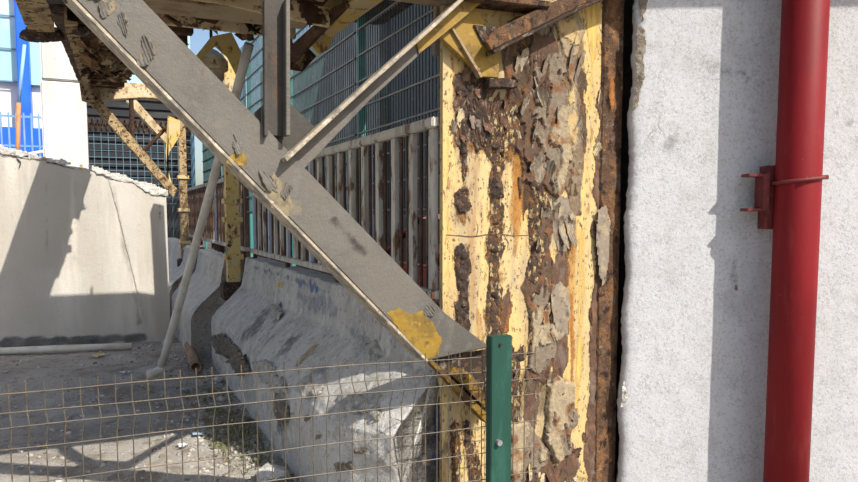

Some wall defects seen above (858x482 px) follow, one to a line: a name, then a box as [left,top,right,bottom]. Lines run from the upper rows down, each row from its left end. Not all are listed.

flaking render [632,0,648,111]
spalling [0,144,71,165]
spalling [88,165,168,197]
corrosion [451,69,522,336]
peeling [502,3,602,482]
corrosion [531,79,615,482]
peeling [596,206,611,285]
water stain [0,334,146,347]
spalling [211,333,324,426]
corrosion [511,231,576,428]
corrosion [450,418,483,482]